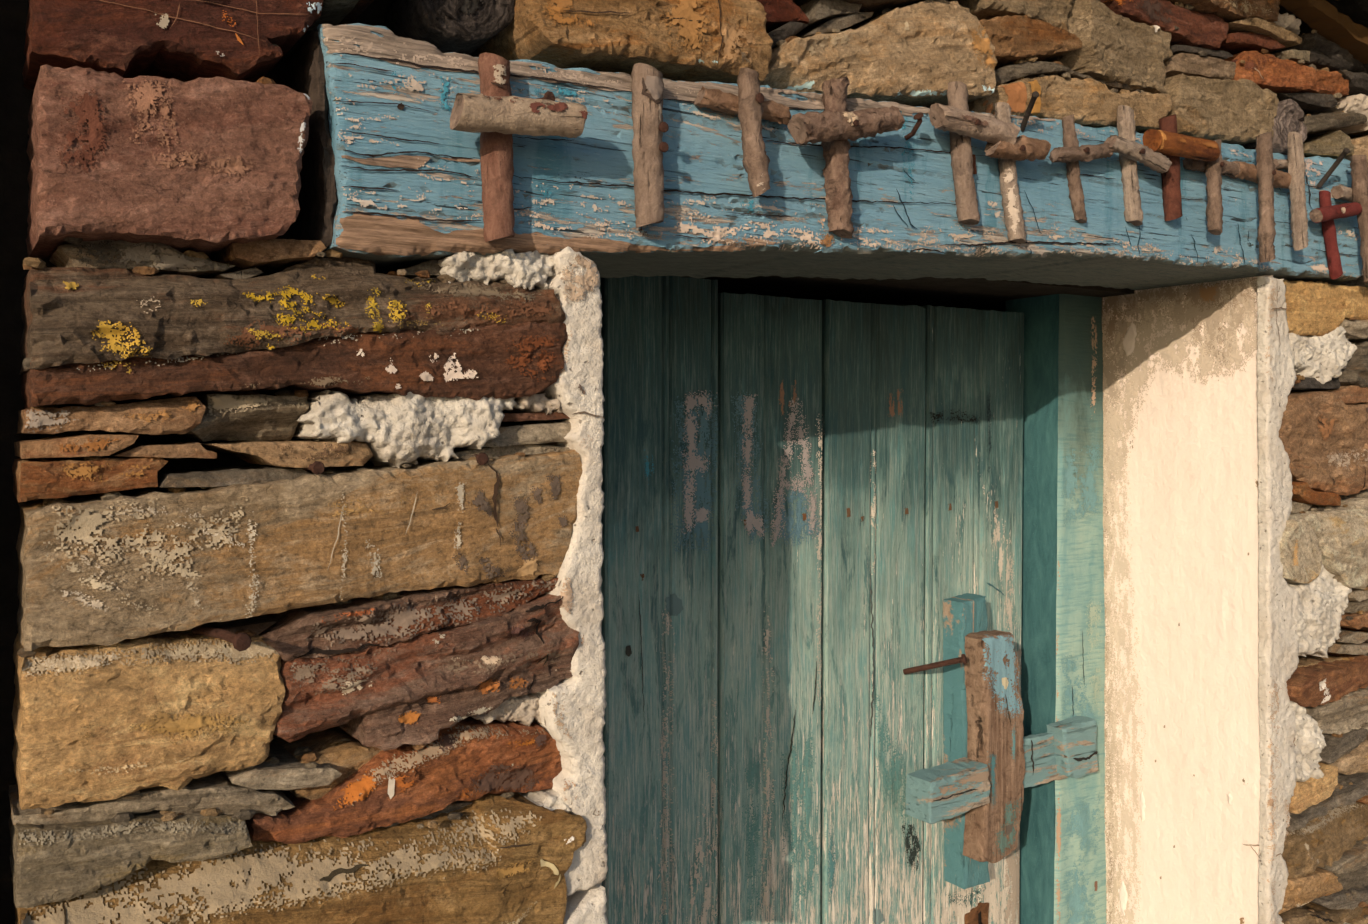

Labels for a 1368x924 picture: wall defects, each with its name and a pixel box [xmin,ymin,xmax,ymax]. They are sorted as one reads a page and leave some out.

corrosion [971,23,1041,116]
peeling [316,23,1286,288]
spalling [23,257,46,270]
peeling [1311,263,1361,284]
spalling [1090,317,1098,419]
spalling [235,389,309,397]
spalling [167,485,229,493]
spalling [373,592,401,600]
spalling [17,646,125,674]
spalling [242,747,320,770]
spalling [44,801,80,815]
spalling [105,790,142,823]